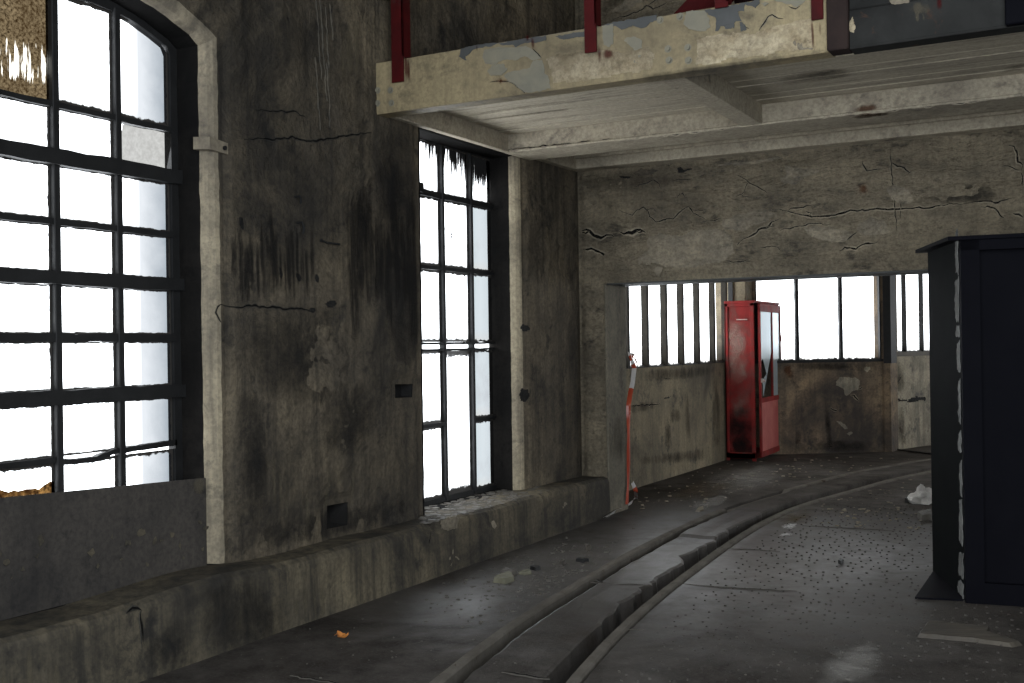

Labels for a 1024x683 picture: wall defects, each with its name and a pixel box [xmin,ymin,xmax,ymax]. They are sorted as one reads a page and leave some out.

peeling [683,0,813,65]
crack [726,145,1024,263]